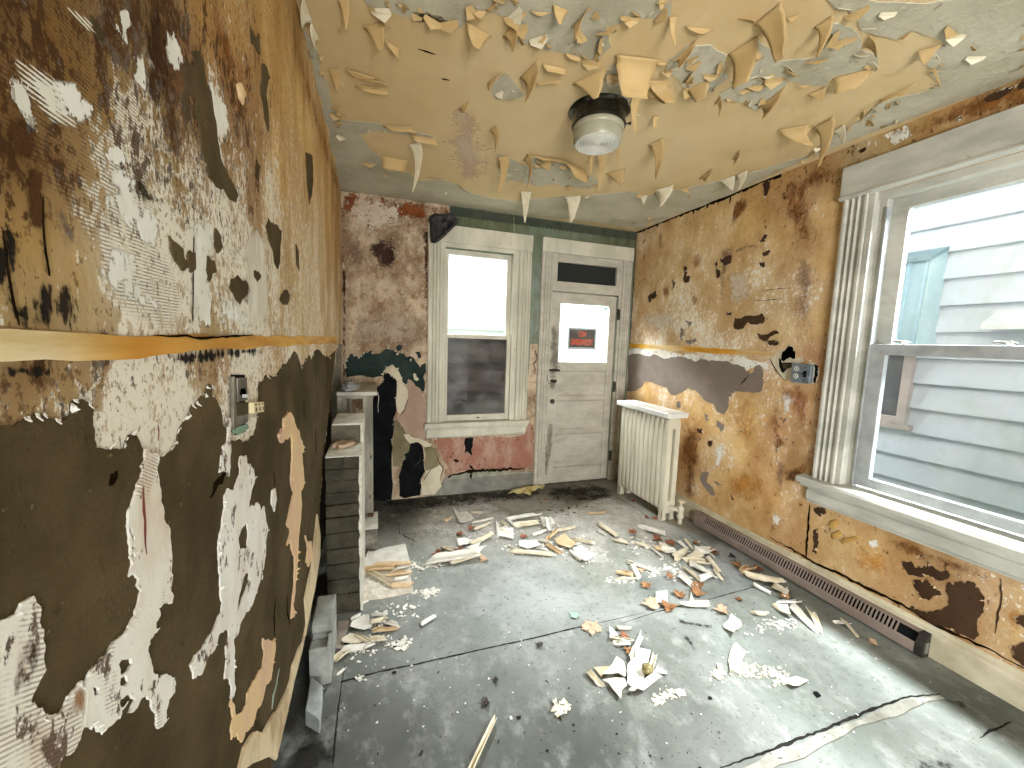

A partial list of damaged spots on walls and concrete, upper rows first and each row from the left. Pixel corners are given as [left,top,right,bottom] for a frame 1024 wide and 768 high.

spalling [182,50,238,202]
peeling [363,0,897,134]
spalling [168,228,223,282]
spalling [229,270,261,304]
spalling [266,218,282,269]
leakage [324,139,448,377]
peeling [627,311,819,449]
peeling [0,399,150,722]
peeling [55,344,534,768]
crack [770,504,1024,669]
spalling [902,554,985,640]
spalling [1009,642,1024,668]